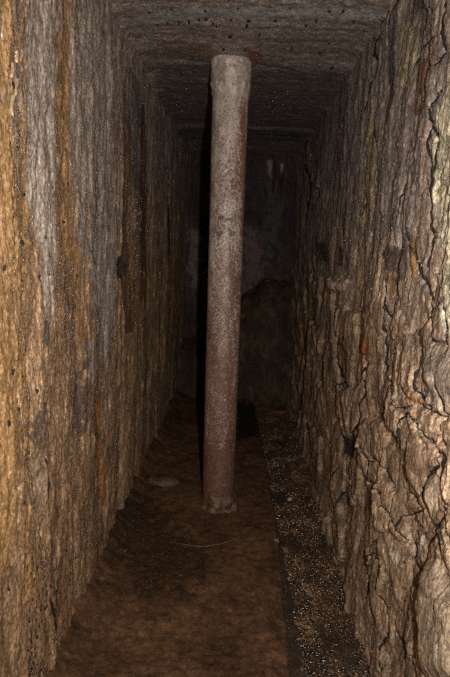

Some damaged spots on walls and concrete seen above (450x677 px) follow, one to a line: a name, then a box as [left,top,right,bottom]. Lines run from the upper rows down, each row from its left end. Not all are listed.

crack [364,0,398,110]
crack [413,1,447,71]
corrosion [206,97,271,387]
crack [330,89,448,571]
crack [365,540,406,677]